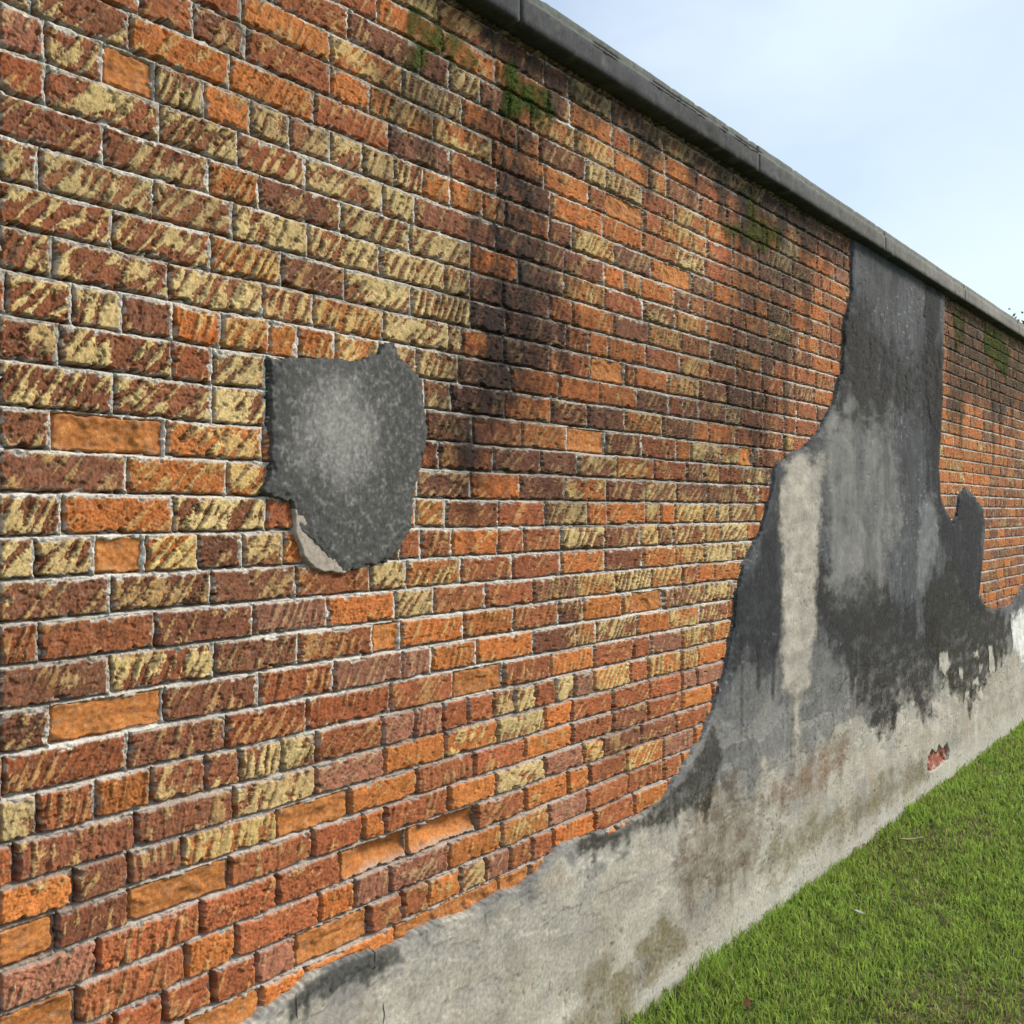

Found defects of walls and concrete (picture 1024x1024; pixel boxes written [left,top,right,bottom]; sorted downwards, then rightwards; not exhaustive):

leakage [687,155,848,403]
peeling [274,239,1024,1000]
leakage [730,285,1024,776]